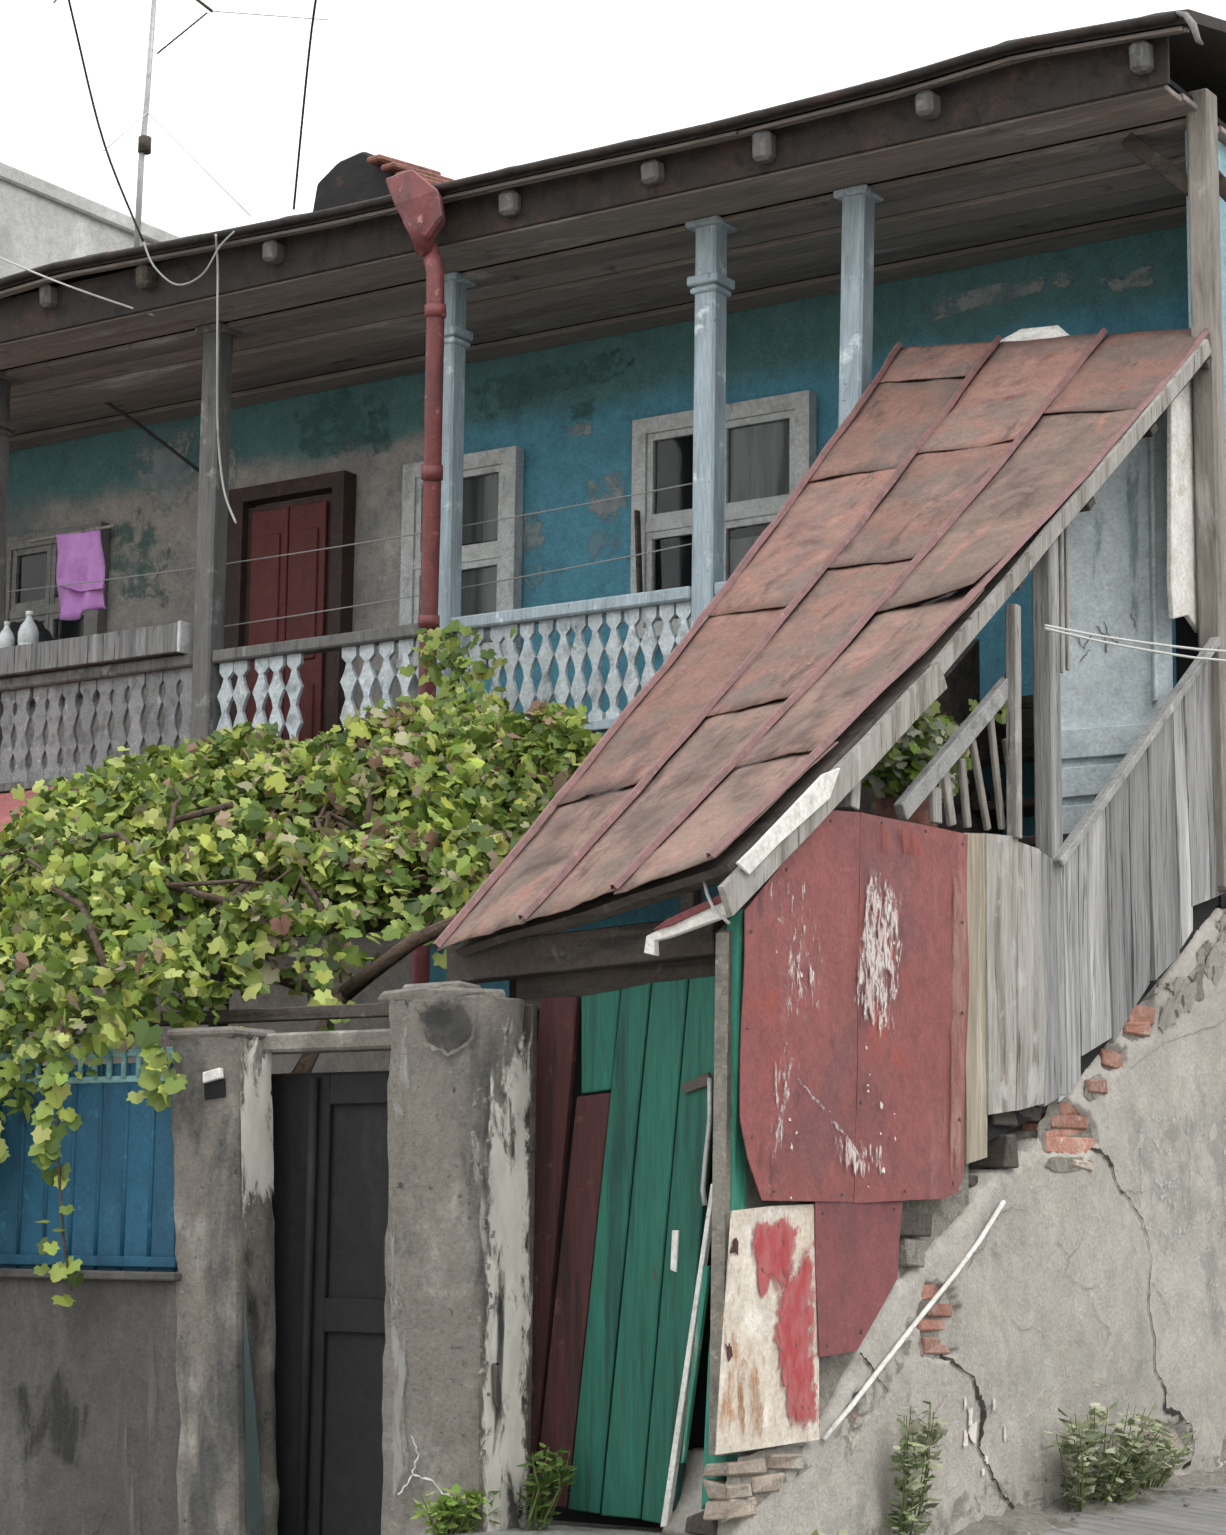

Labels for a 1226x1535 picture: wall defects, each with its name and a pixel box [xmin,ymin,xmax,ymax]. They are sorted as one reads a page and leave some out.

peeling [924,272,1074,321]
peeling [1101,265,1155,292]
peeling [240,1037,274,1216]
peeling [857,871,902,1050]
spalling [1023,909,1226,1172]
damp [18,1373,86,1462]
peeling [391,1286,408,1498]
peeling [459,1033,532,1532]
spalling [916,1283,952,1359]
crack [860,1352,1014,1509]
crack [1090,1147,1195,1469]